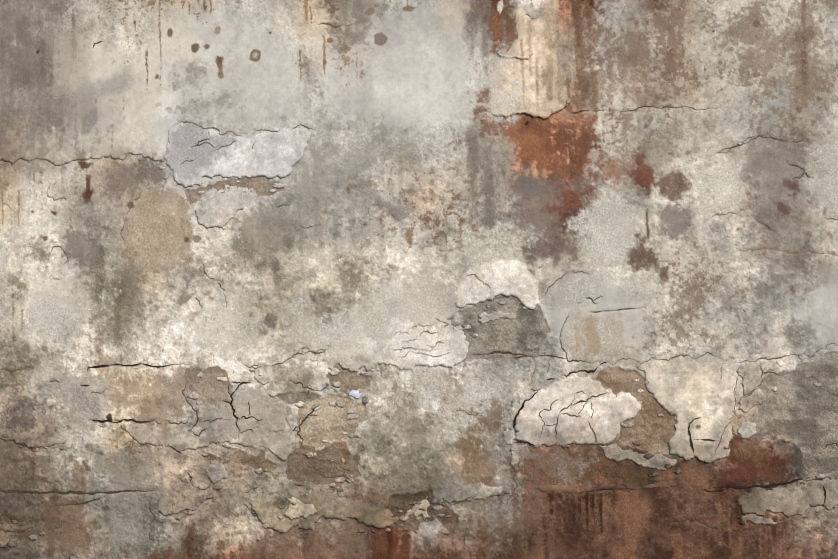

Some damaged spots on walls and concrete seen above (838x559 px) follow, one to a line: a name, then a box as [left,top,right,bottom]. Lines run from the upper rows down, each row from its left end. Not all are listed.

flaking render [0,122,311,229]
rust [104,0,221,90]
rust [285,0,376,87]
rust [383,173,482,253]
flaking render [486,0,572,119]
rust [472,0,708,231]
crack [712,135,808,178]
damp [0,226,105,340]
crack [81,363,349,478]
flaking render [93,257,551,541]
rust [457,400,806,559]
flaking render [502,351,838,525]